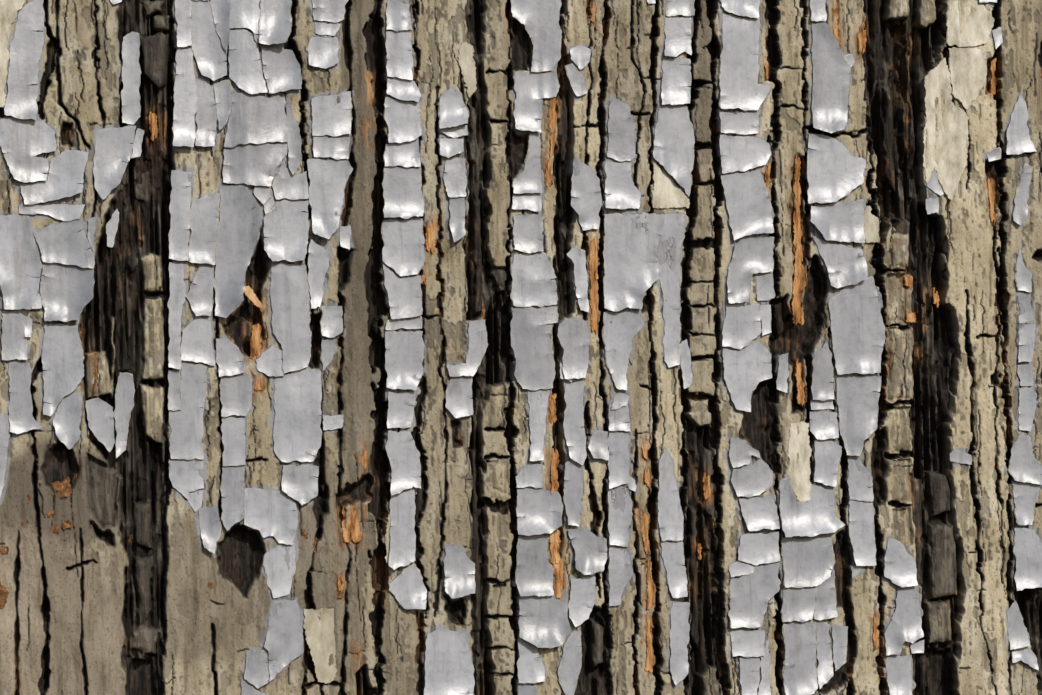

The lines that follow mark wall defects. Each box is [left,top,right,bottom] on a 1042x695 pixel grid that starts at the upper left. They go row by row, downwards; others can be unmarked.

crack [14,358,98,695]
peeling [0,0,144,497]
crack [91,180,99,217]
peeling [167,0,353,695]
peeling [381,1,427,610]
peeling [424,629,475,695]
peeling [438,42,477,242]
peeling [445,319,488,418]
peeling [510,0,695,695]
crack [573,0,732,695]
peeling [718,0,924,695]
peeling [1006,248,1042,671]